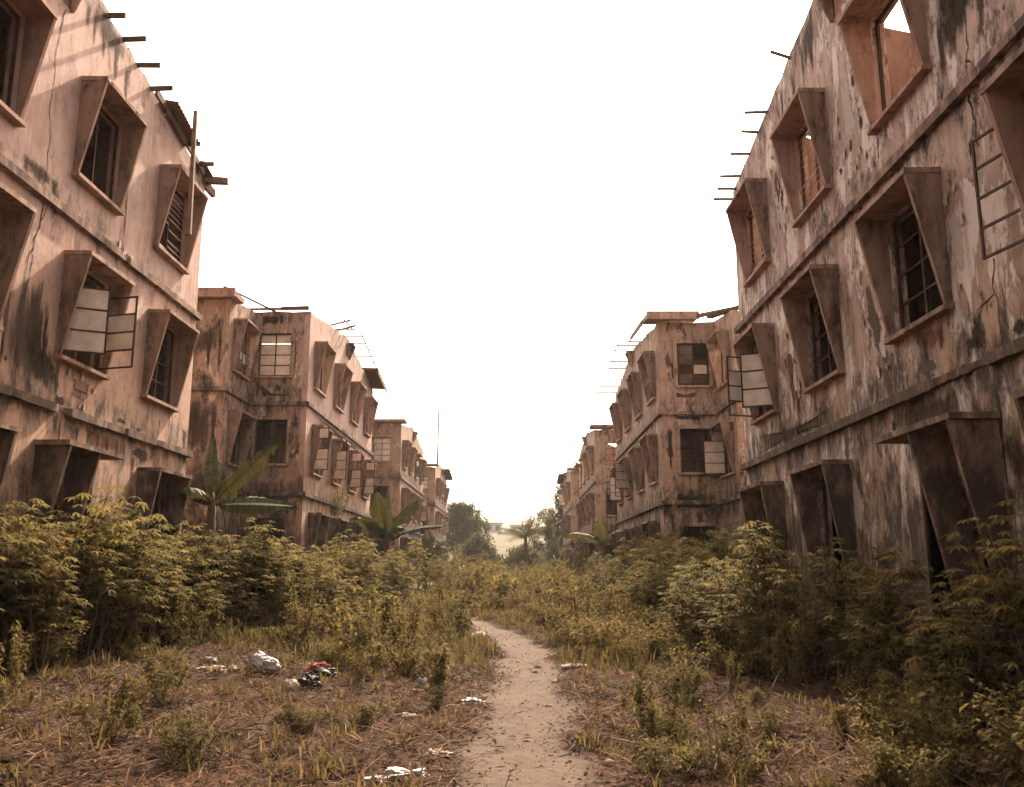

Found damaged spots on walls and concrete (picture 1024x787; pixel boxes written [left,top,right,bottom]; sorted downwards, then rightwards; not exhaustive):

damp [937,0,983,72]
crack [962,0,980,157]
crack [26,9,66,349]
damp [0,277,64,439]
damp [192,322,223,371]